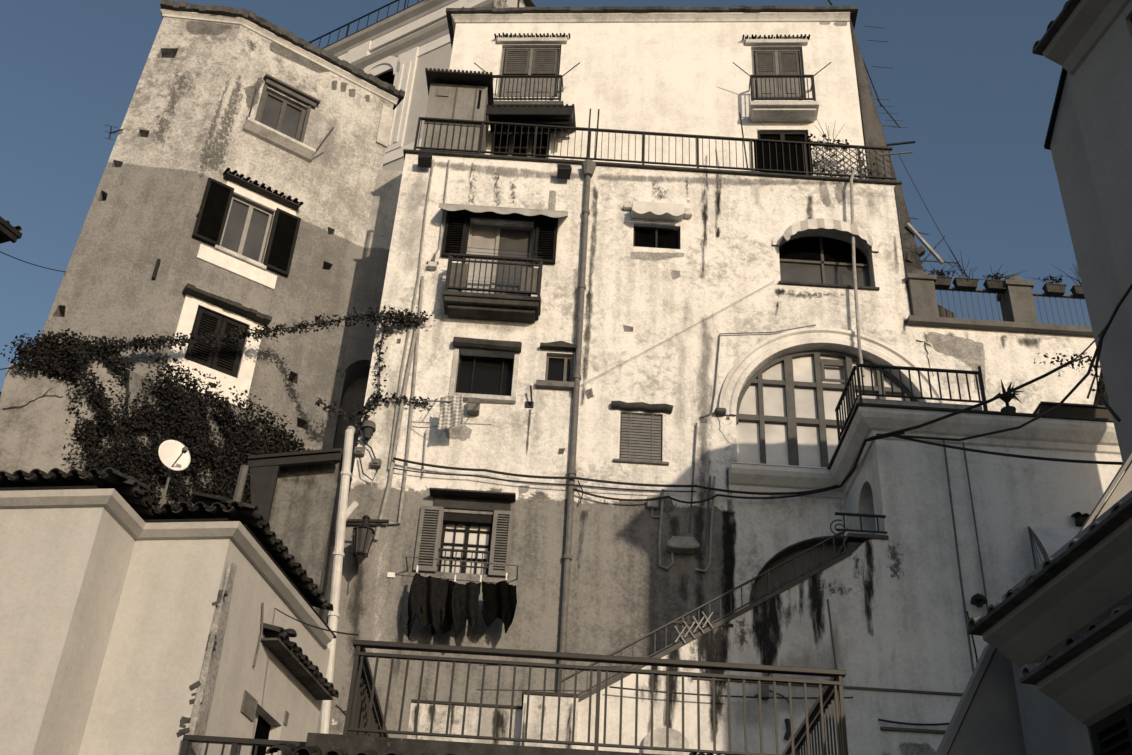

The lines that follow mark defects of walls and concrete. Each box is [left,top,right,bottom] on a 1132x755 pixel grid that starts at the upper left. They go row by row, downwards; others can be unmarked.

water stain [641,321,736,739]
water stain [750,564,824,676]
water stain [863,538,874,632]